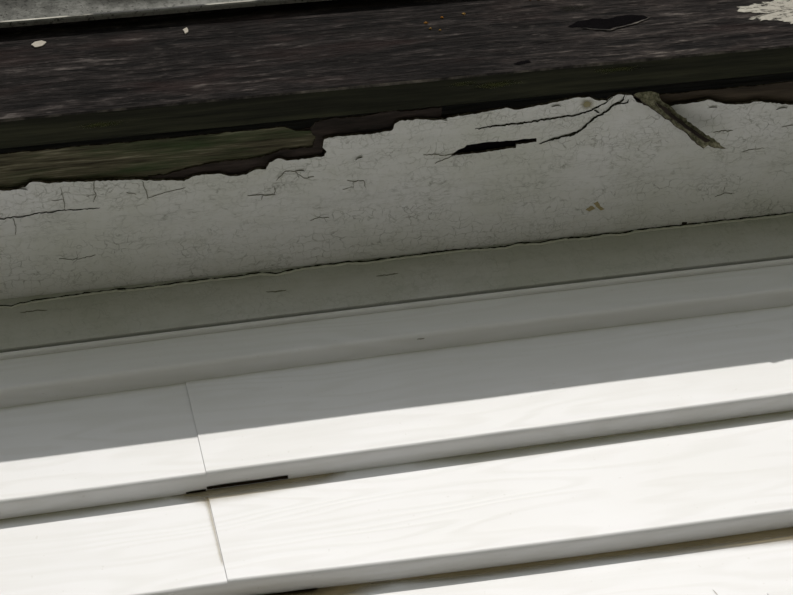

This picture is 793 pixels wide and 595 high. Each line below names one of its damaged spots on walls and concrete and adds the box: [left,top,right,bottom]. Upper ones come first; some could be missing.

peeling [738,0,793,24]
crack [475,95,629,144]
peeling [659,81,793,110]
peeling [0,106,476,191]
crack [0,183,99,235]
crack [247,171,314,200]
crack [0,212,793,313]